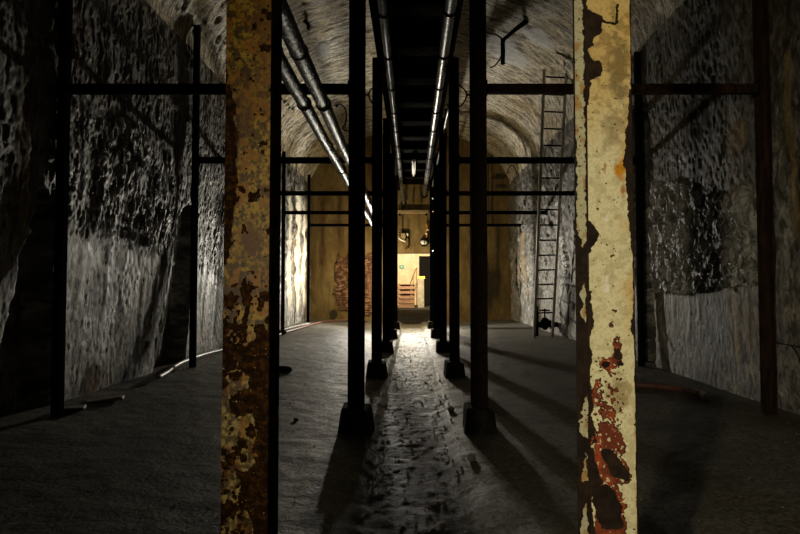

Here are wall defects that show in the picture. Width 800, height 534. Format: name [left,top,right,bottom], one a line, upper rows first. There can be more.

flaking render [334,255,348,312]
peeling [574,0,637,534]